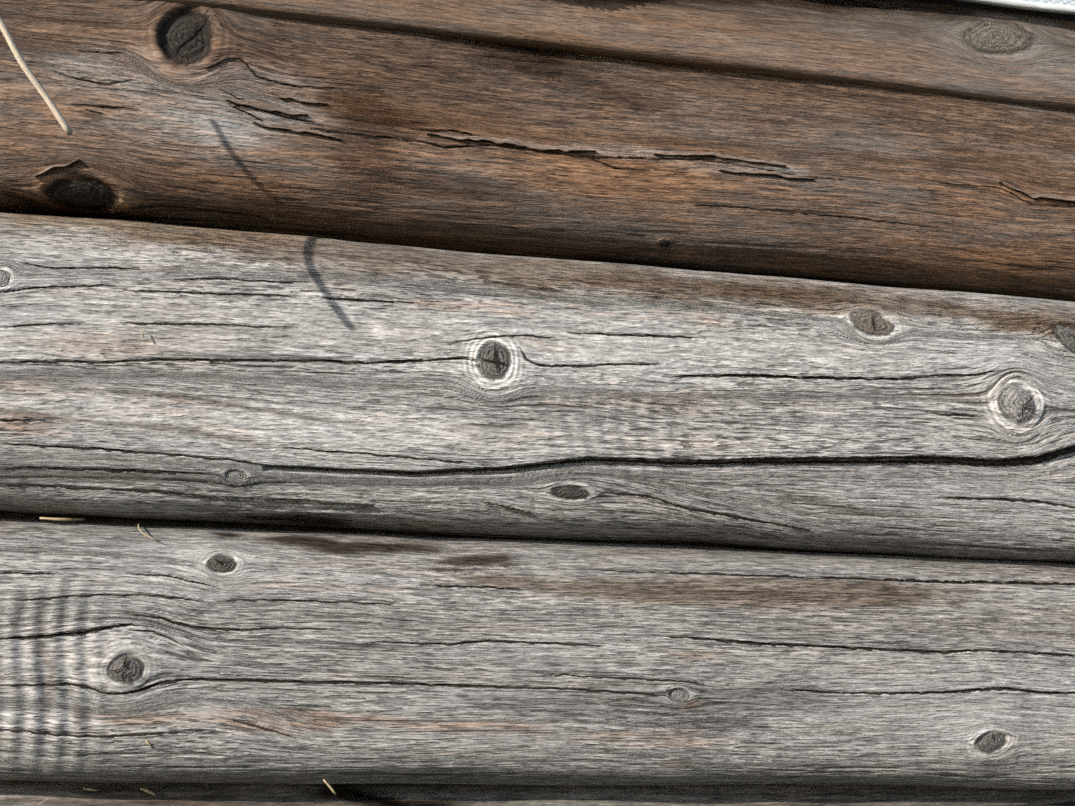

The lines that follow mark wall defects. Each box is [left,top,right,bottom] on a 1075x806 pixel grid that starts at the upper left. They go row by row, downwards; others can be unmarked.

crack [206,57,843,180]
crack [939,182,1075,207]
crack [702,204,938,228]
crack [0,417,1075,508]
crack [483,502,532,514]
crack [596,491,811,531]